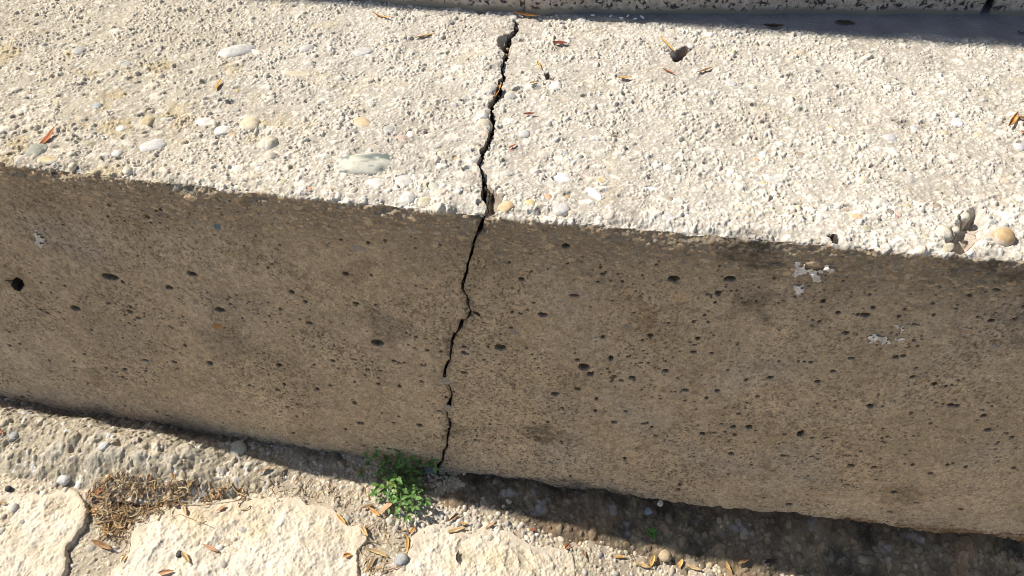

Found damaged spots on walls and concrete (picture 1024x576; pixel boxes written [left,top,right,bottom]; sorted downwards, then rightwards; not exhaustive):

crack [439,22,519,467]
peeling [787,262,835,297]